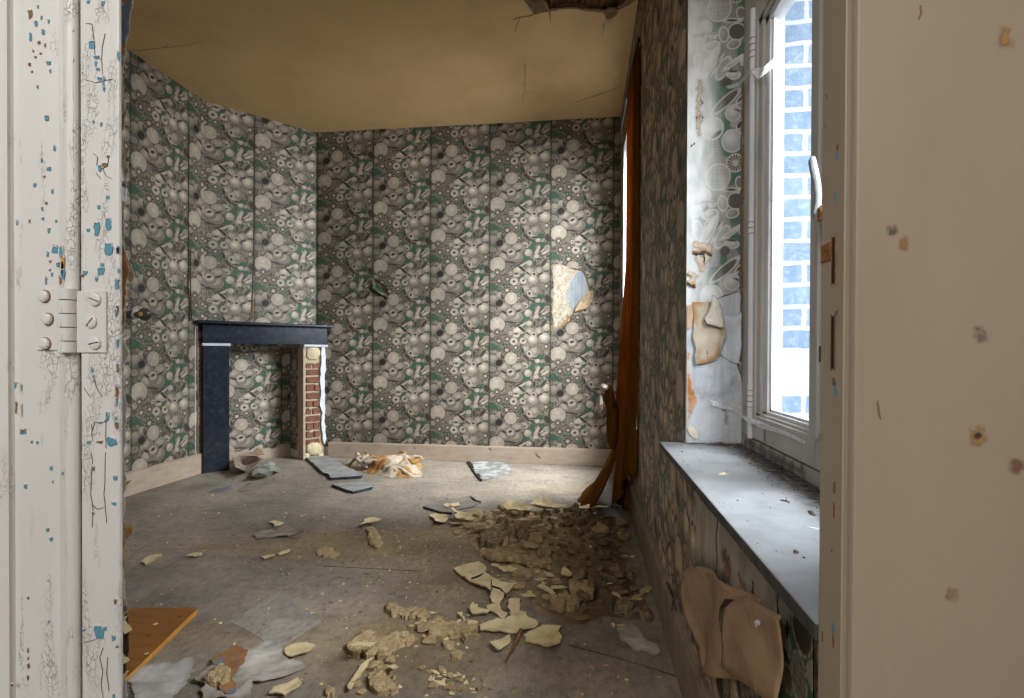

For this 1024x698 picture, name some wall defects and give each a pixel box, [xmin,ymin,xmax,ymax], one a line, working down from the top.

flaking render [524,0,635,19]
peeling [27,4,51,89]
peeling [88,40,106,91]
crack [85,23,112,83]
peeling [15,188,65,285]
peeling [72,195,120,290]
flaking render [566,271,589,311]
peeling [686,295,726,439]
spalling [721,549,754,594]